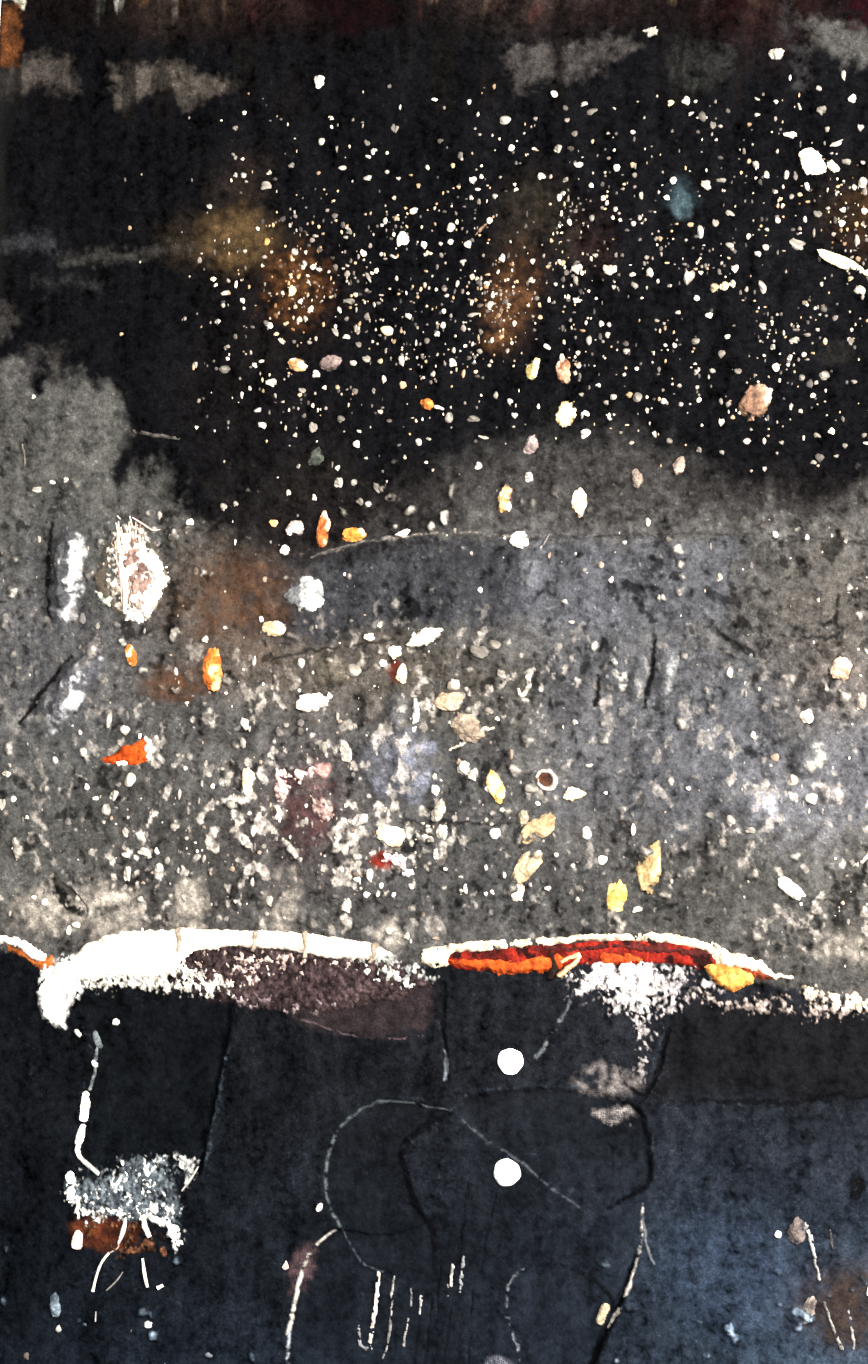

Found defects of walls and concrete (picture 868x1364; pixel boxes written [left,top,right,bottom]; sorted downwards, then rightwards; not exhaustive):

crack [715,626,755,657]
crack [803,579,862,689]
peeling [0,927,868,1292]